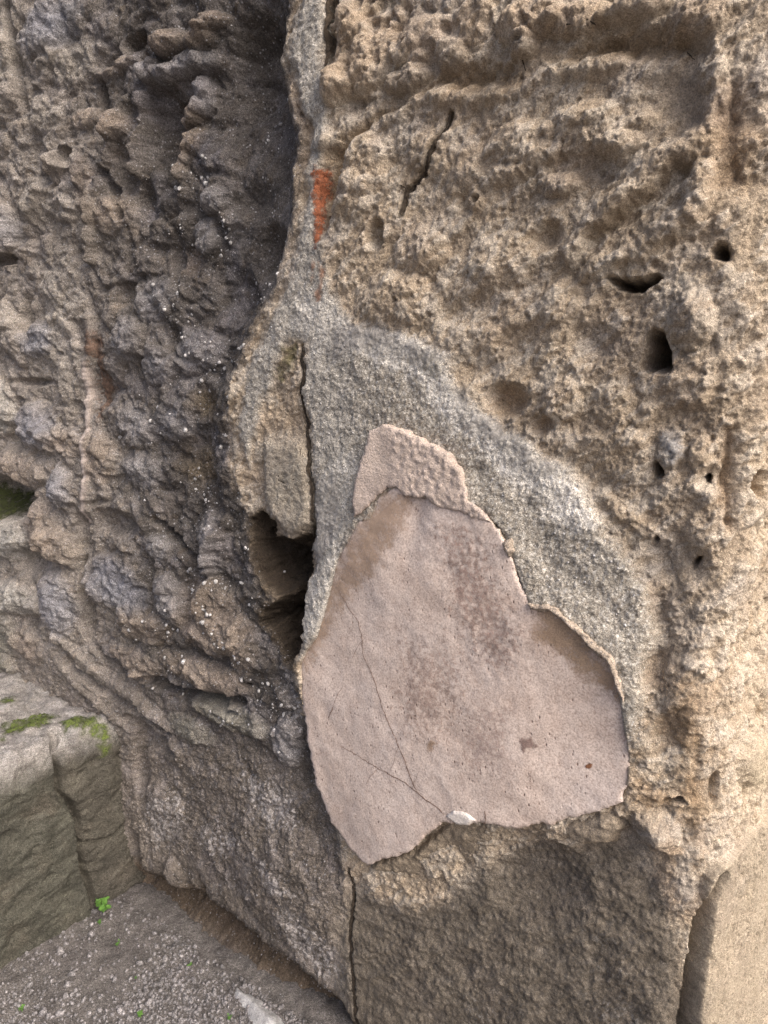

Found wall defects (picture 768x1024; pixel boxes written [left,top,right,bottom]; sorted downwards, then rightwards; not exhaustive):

crack [400,115,451,214]
crack [278,348,314,537]
spalling [237,0,660,752]
crack [337,588,443,814]
crack [348,872,360,1023]